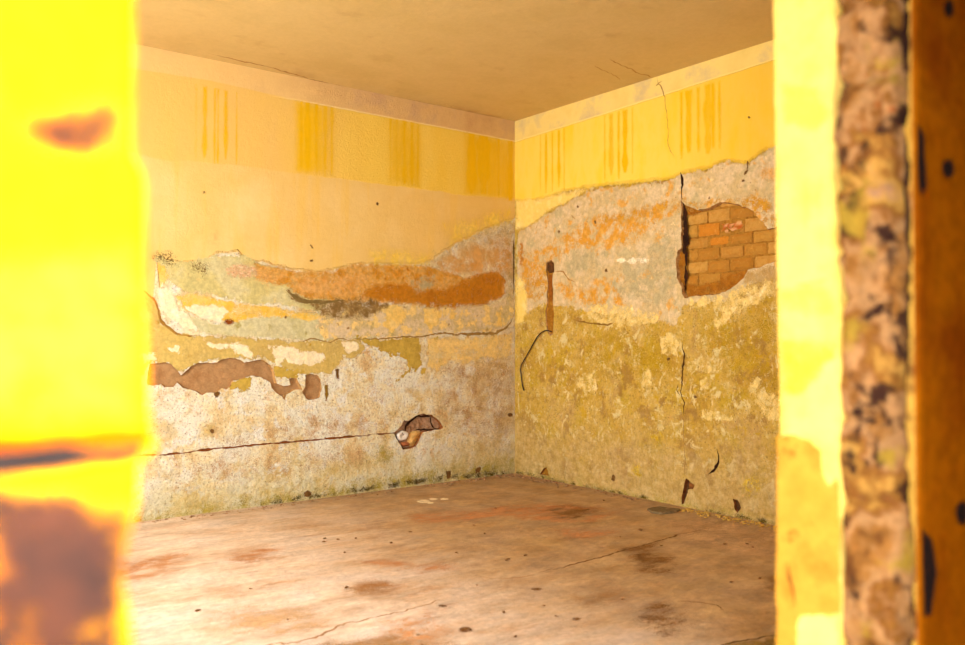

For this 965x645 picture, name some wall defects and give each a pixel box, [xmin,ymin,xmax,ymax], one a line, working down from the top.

leakage [292,101,339,179]
leakage [604,107,634,180]
leakage [679,81,722,159]
peeling [146,146,778,400]
flaking render [394,414,443,450]
leakage [190,604,462,645]
crack [269,598,446,645]
leakage [342,578,407,597]
leakage [563,586,700,642]